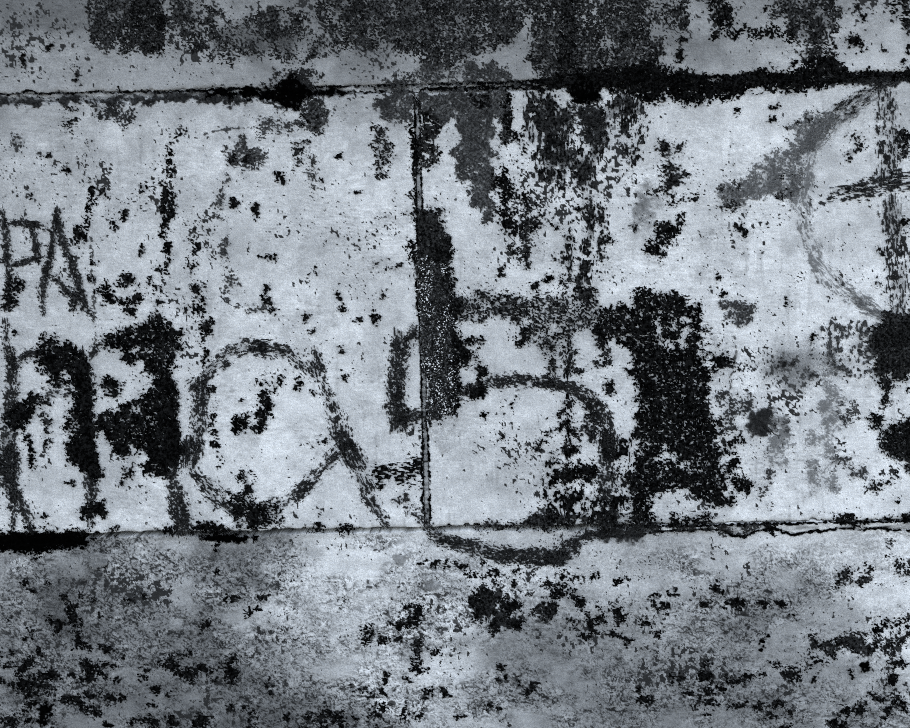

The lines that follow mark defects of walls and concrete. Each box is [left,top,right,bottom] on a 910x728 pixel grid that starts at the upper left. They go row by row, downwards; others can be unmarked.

water stain [827,72,910,88]
water stain [412,83,513,226]
water stain [523,88,649,303]
water stain [631,179,656,231]